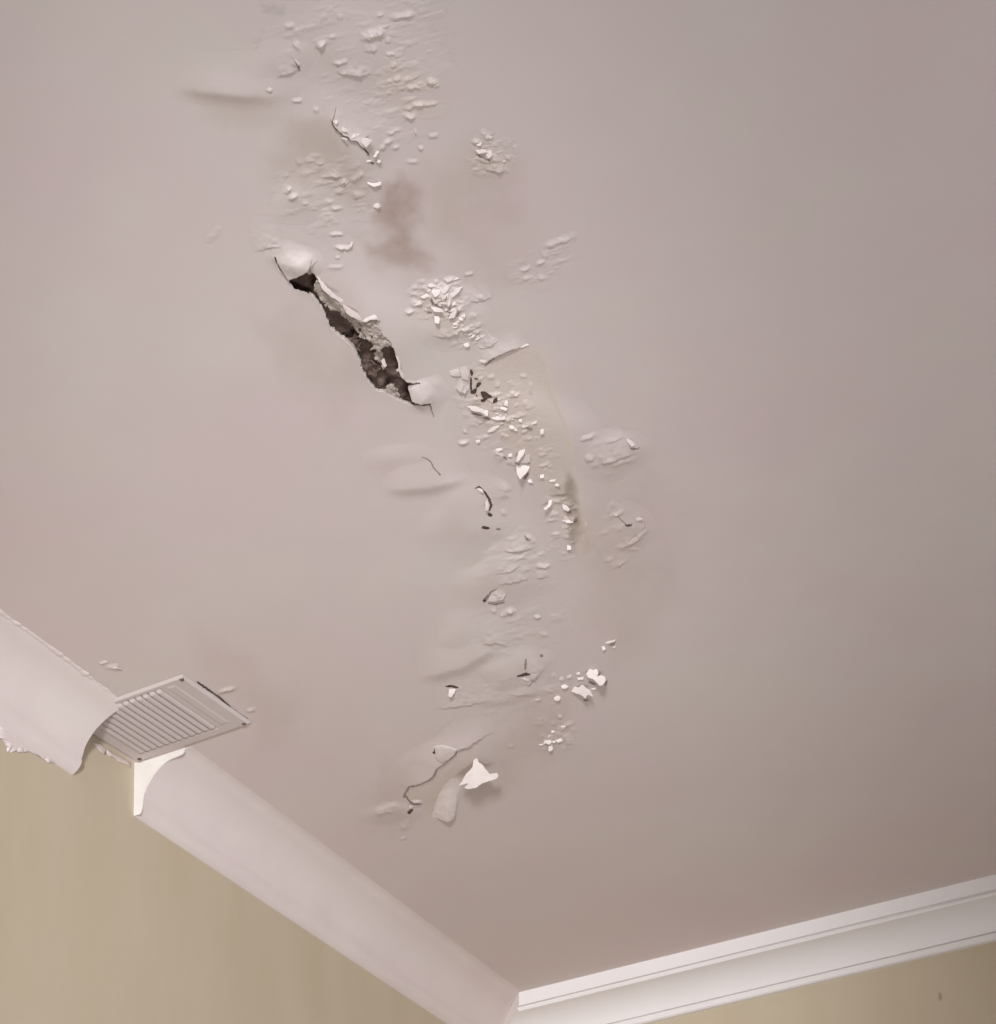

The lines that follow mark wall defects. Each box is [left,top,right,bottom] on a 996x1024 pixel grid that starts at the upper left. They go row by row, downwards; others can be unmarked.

peeling [463,127,522,179]
peeling [404,269,609,567]
peeling [372,715,499,842]
peeling [530,669,607,762]